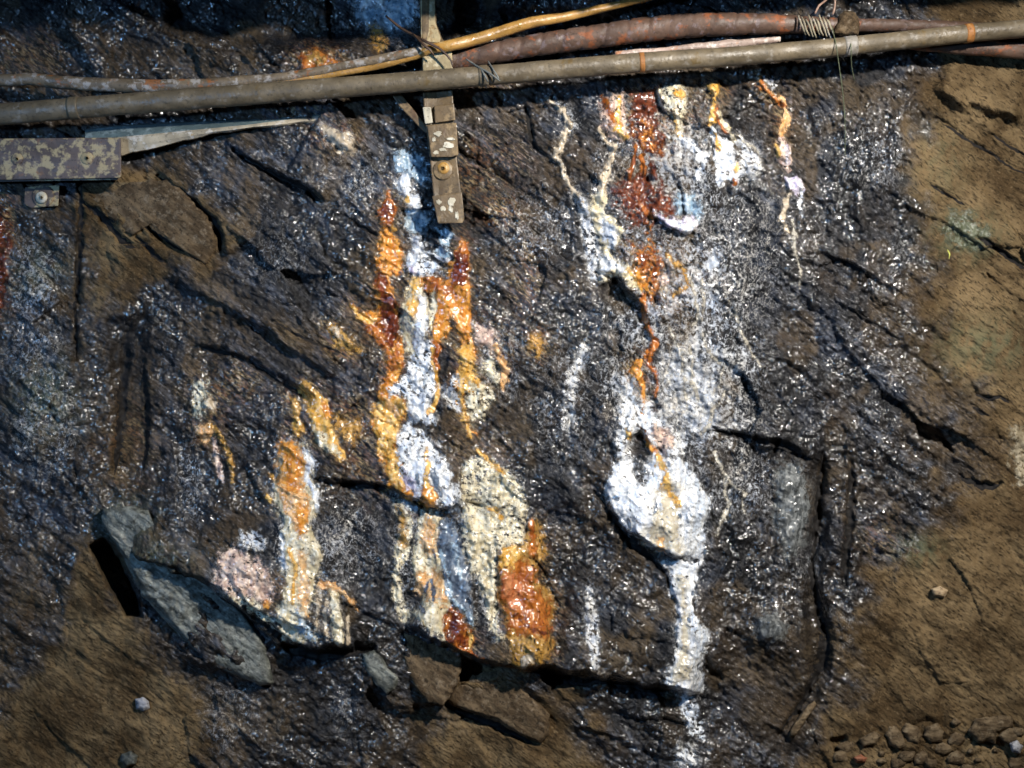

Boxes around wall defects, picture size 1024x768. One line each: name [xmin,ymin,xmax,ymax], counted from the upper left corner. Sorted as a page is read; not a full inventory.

corrosion [289,190,420,506]
corrosion [418,240,481,438]
water stain [386,149,527,642]
corrosion [611,88,691,441]
crack [826,255,873,280]
crack [851,309,901,339]
crack [972,394,1009,416]
corrosion [442,605,489,665]
corrosion [496,519,556,672]
crack [542,668,685,725]
water stain [604,339,727,768]
crack [713,430,855,734]